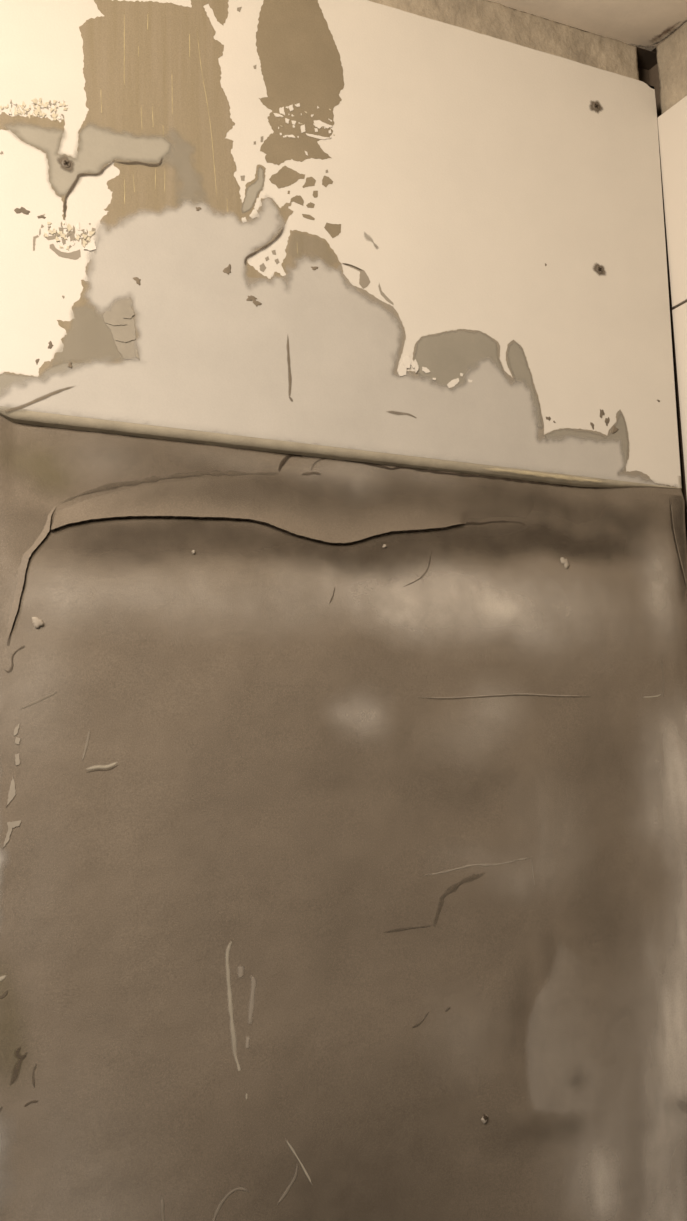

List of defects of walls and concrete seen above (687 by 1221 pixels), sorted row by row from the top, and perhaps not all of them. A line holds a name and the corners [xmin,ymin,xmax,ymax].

peeling [0,0,677,488]
crack [8,454,601,672]
water stain [94,519,620,565]
water stain [226,942,256,1071]